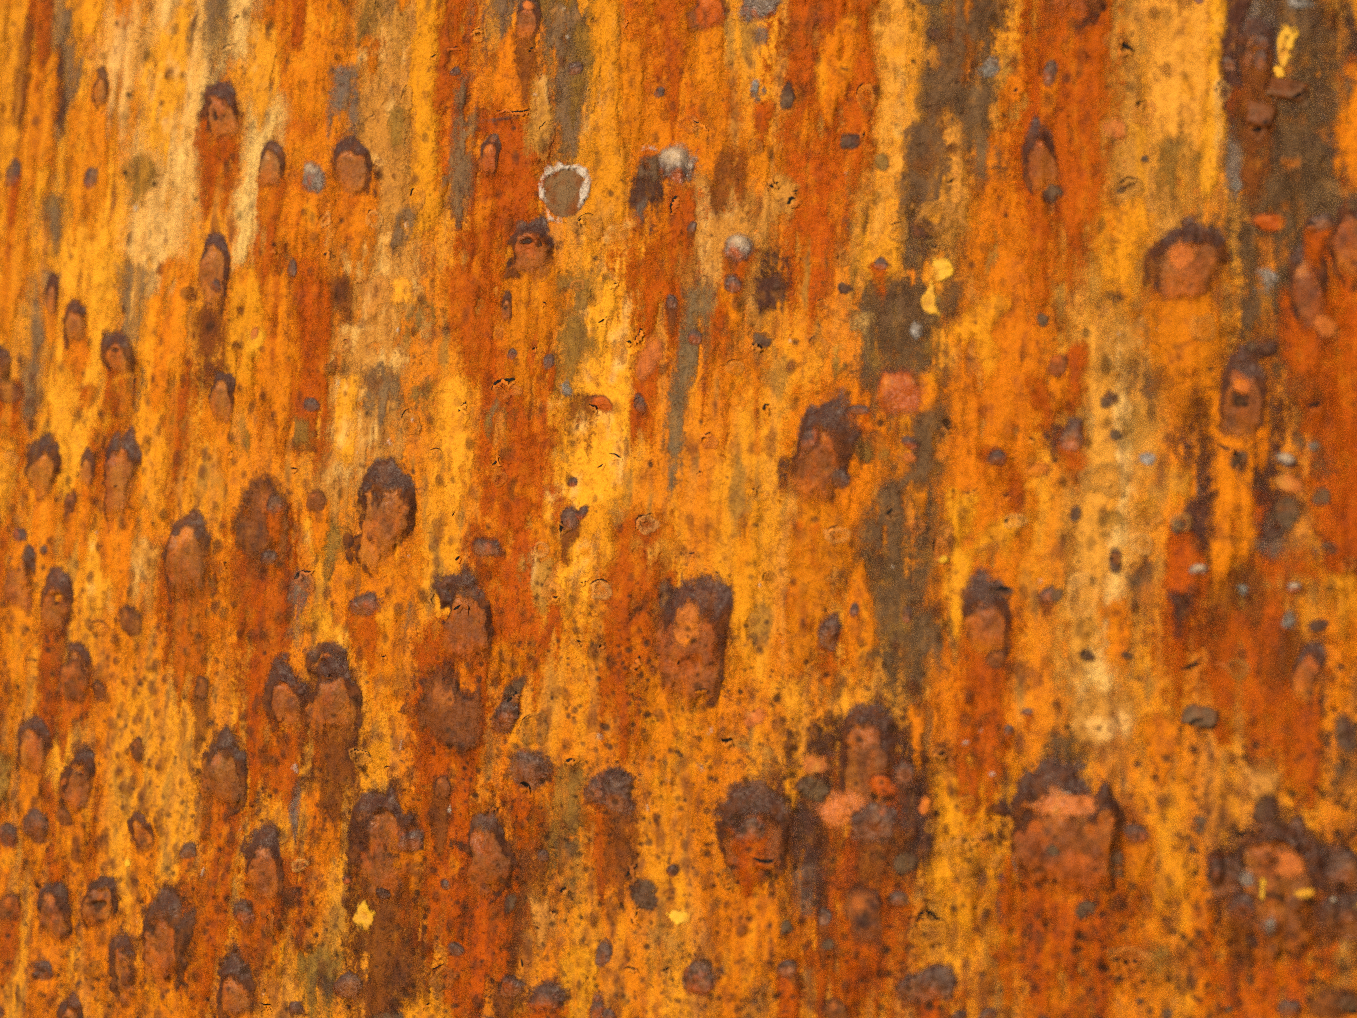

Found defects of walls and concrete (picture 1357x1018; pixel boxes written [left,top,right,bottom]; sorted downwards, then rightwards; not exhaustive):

rust [0,0,612,1018]
rust [582,0,1357,1018]